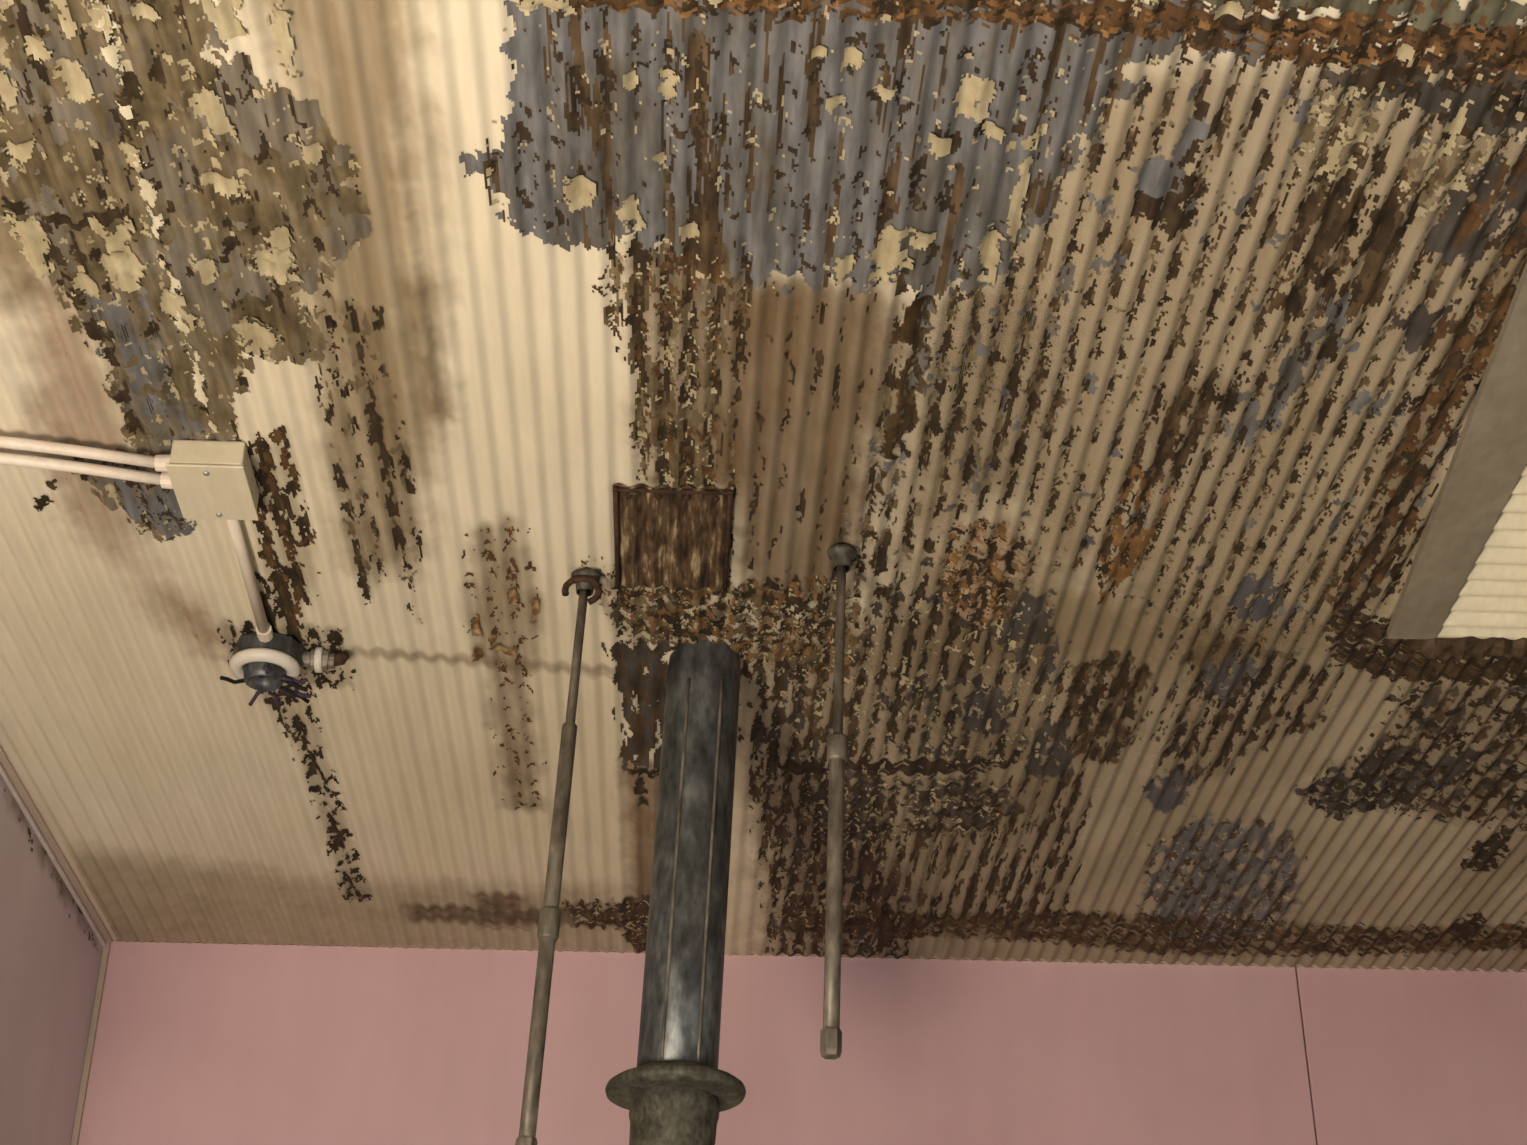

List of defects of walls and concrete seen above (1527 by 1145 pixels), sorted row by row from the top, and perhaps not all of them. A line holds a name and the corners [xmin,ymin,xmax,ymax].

rust [517,0,1527,498]
peeling [0,0,423,903]
rust [462,518,547,810]
rust [581,556,873,677]
rust [937,516,1041,627]
peeling [459,0,1527,959]
rust [1089,456,1172,606]
rust [1320,603,1527,689]
peeling [4,790,96,947]
rust [779,903,1527,958]
rust [1460,825,1524,873]